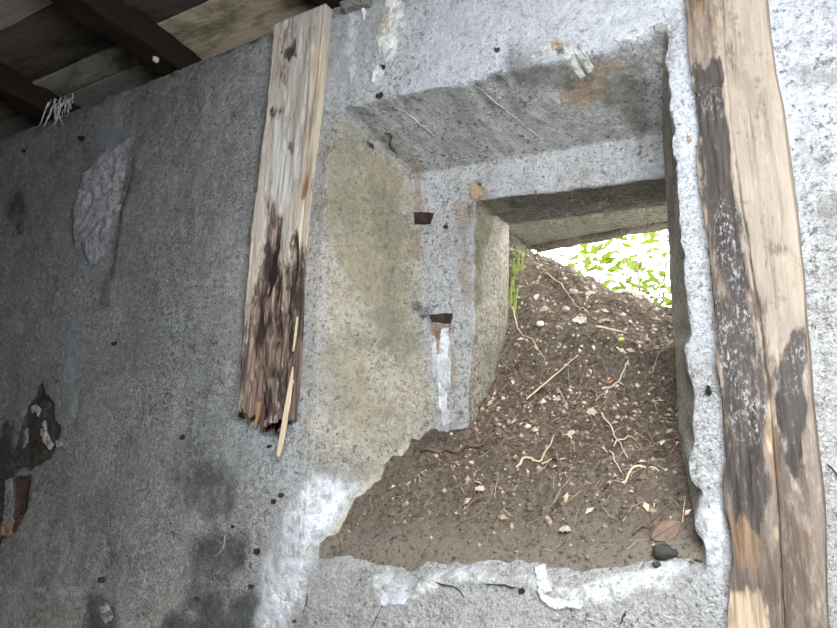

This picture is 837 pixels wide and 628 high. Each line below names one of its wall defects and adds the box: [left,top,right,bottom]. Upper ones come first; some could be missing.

peeling [346,8,368,78]
peeling [365,0,407,99]
spalling [529,34,609,105]
peeling [13,382,63,471]
water stain [0,422,17,525]
water stain [162,473,383,628]
water stain [87,595,113,628]